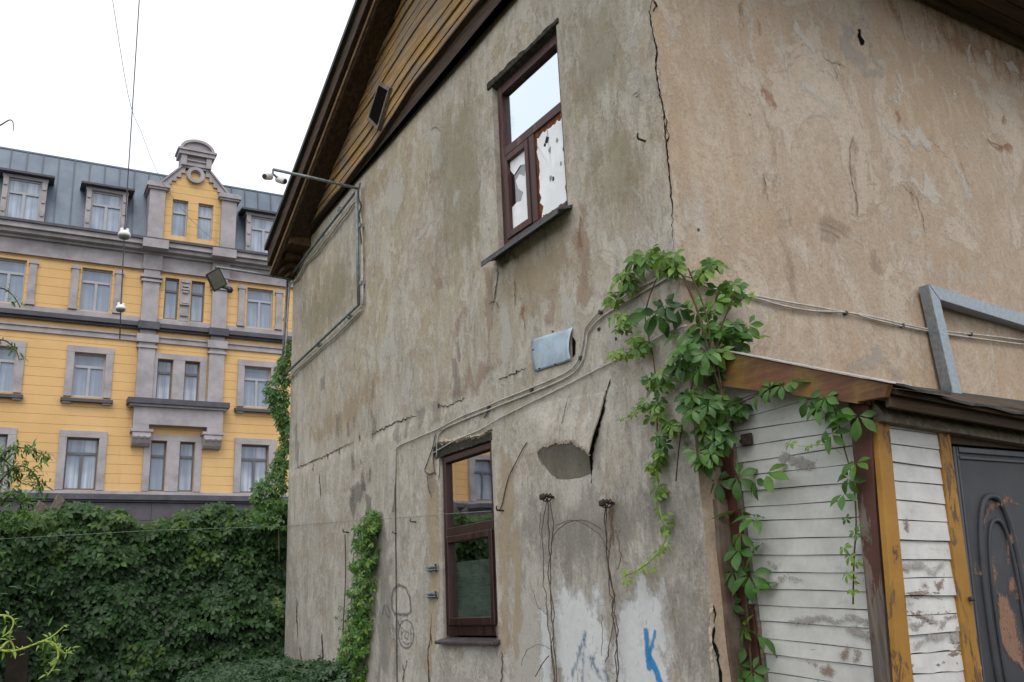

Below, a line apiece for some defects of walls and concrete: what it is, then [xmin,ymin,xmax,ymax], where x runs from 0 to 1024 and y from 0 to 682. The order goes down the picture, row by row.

crack [633,0,674,245]
crack [297,398,464,500]
crack [588,381,610,482]
crack [708,604,722,682]